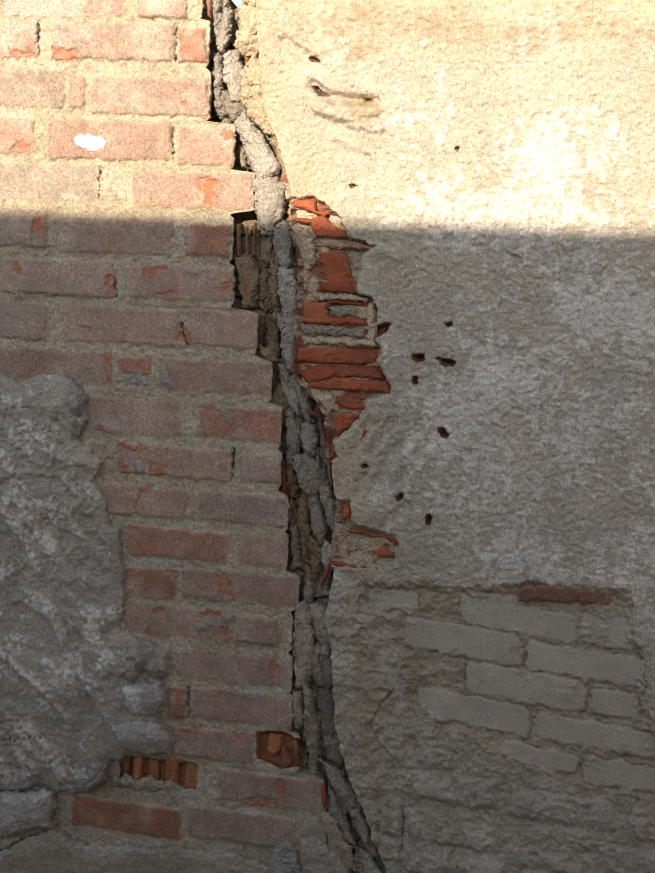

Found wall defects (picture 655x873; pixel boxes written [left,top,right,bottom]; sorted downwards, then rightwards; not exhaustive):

spalling [8,47,36,60]
spalling [51,45,78,63]
spalling [10,139,29,152]
spalling [194,175,219,208]
spalling [30,214,47,238]
spalling [289,196,391,463]
crack [202,0,405,873]
spalling [117,441,165,509]
peeling [331,500,655,800]
spalling [120,756,198,789]
spalling [229,731,301,808]